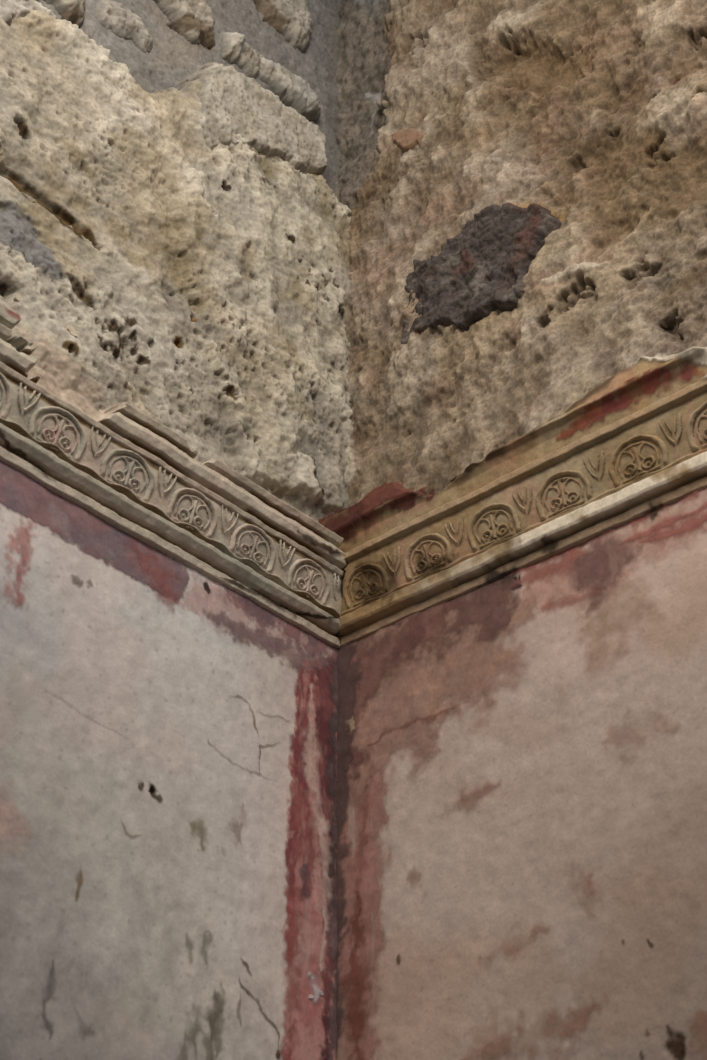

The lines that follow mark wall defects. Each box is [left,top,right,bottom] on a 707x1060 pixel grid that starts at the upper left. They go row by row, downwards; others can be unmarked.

crack [234,695,276,775]
damp [325,580,531,1060]
crack [239,958,281,1059]
spalling [666,1025,685,1060]